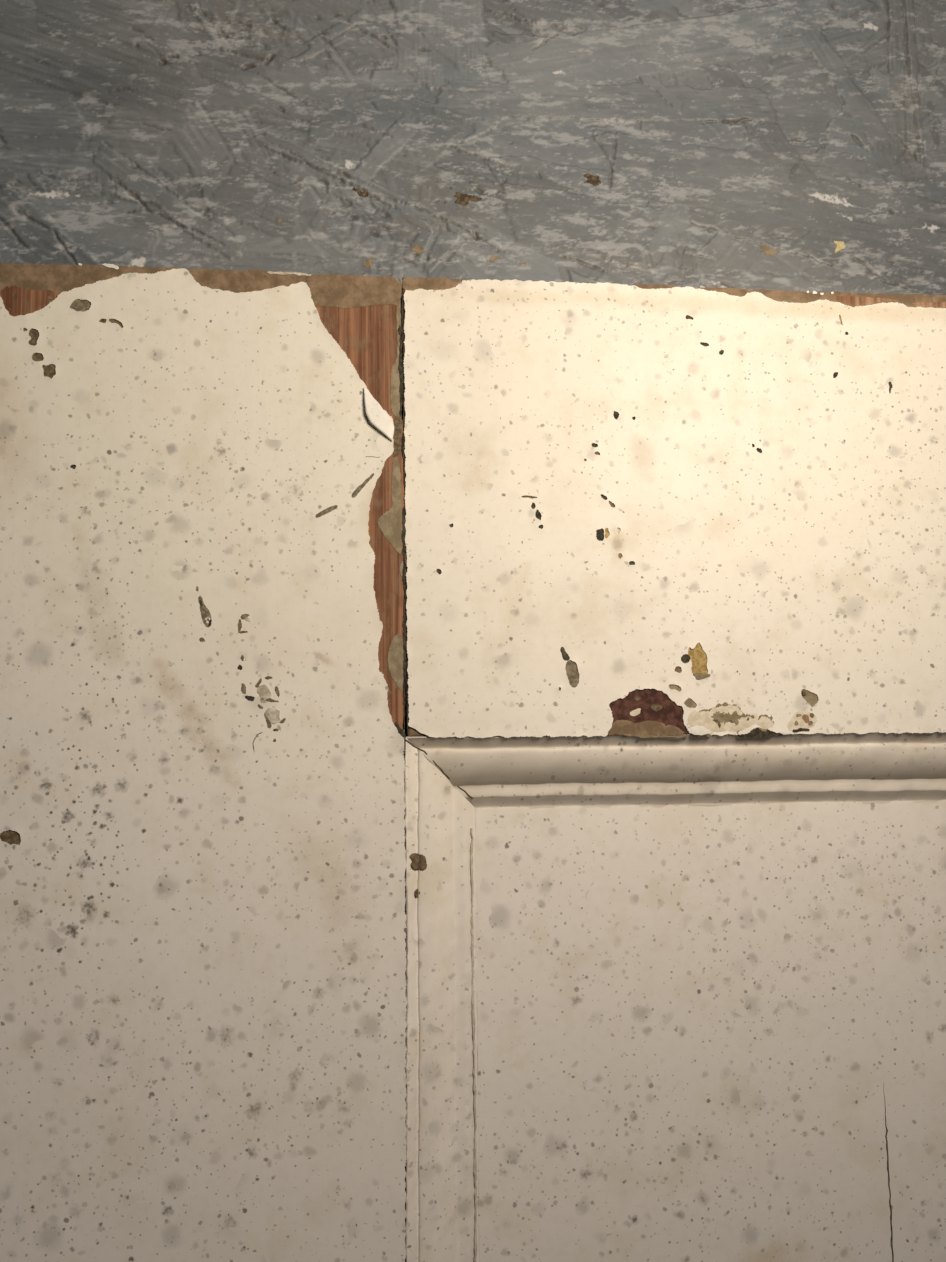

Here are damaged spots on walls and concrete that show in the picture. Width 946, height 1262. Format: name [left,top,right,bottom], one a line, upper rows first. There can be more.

peeling [0,263,171,378]
peeling [189,268,459,737]
peeling [607,643,783,738]
peeling [801,689,818,707]
crack [884,1097,893,1262]